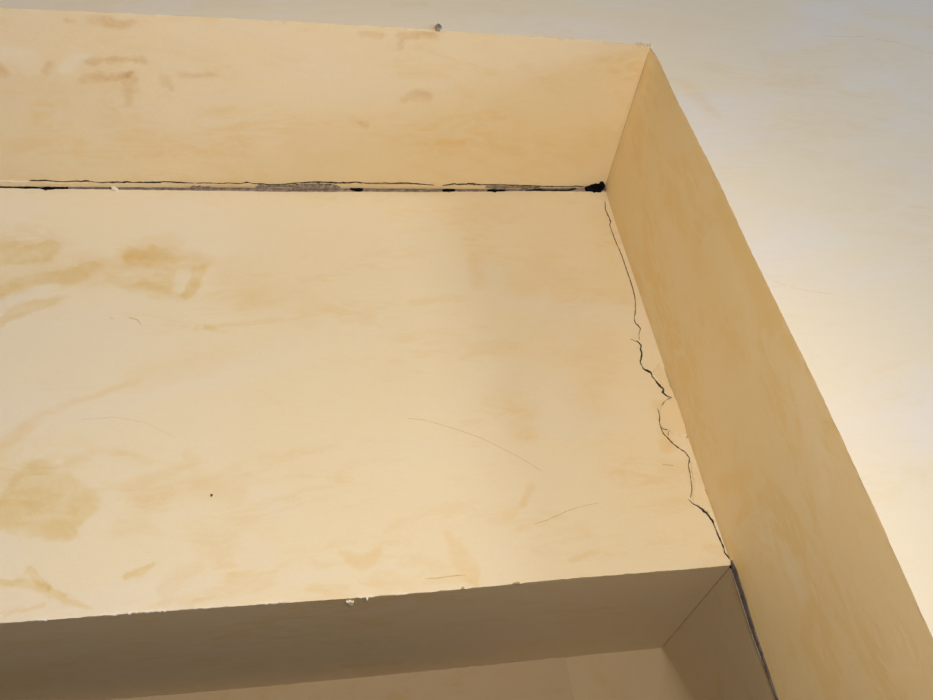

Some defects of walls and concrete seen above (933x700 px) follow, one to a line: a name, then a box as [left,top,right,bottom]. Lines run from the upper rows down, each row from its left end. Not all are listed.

crack [0,180,584,189]
crack [605,55,730,643]